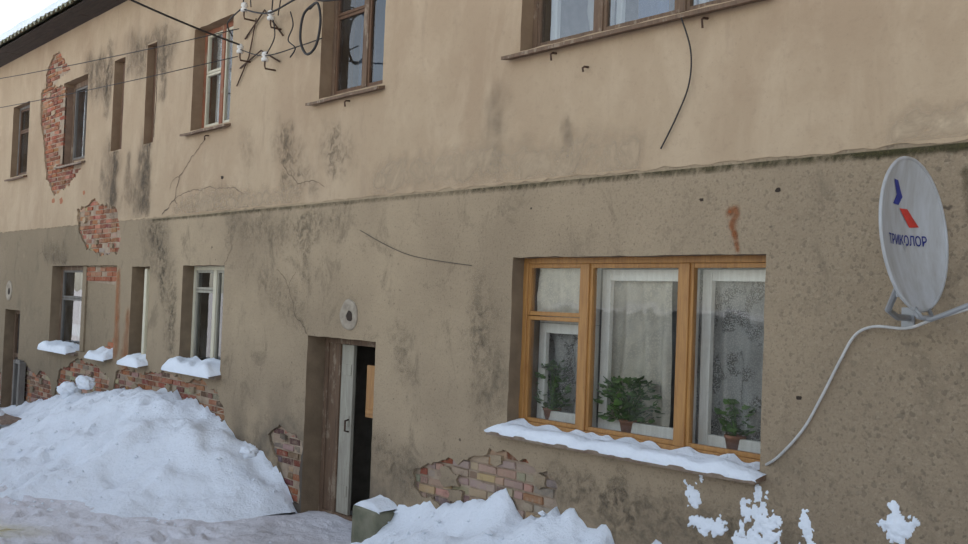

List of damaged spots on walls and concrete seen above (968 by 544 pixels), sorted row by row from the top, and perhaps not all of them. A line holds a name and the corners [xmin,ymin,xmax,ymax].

flaking render [42,53,82,204]
flaking render [79,191,121,285]
rust [727,207,739,251]
flaking render [24,359,224,420]
flaking render [271,427,303,503]
flaking render [416,449,558,519]